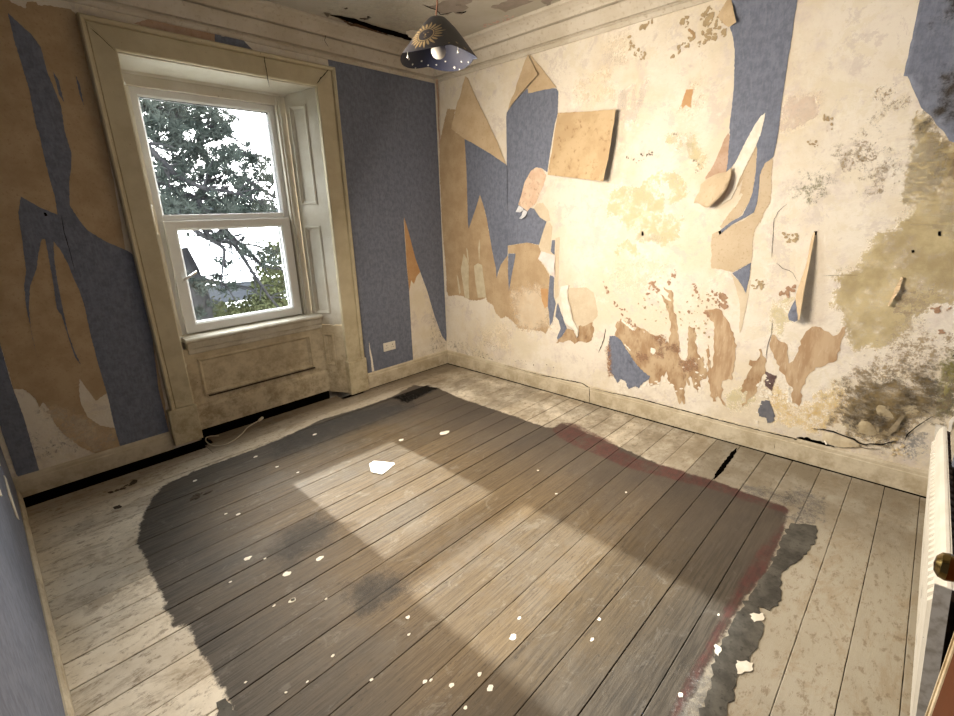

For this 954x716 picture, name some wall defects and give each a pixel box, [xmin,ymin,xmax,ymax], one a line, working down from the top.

peeling [424,0,472,15]
peeling [483,0,552,28]
water stain [770,72,954,458]
peeling [603,270,729,345]
flaking render [611,358,707,392]
peeling [754,374,792,423]
crack [812,414,937,449]